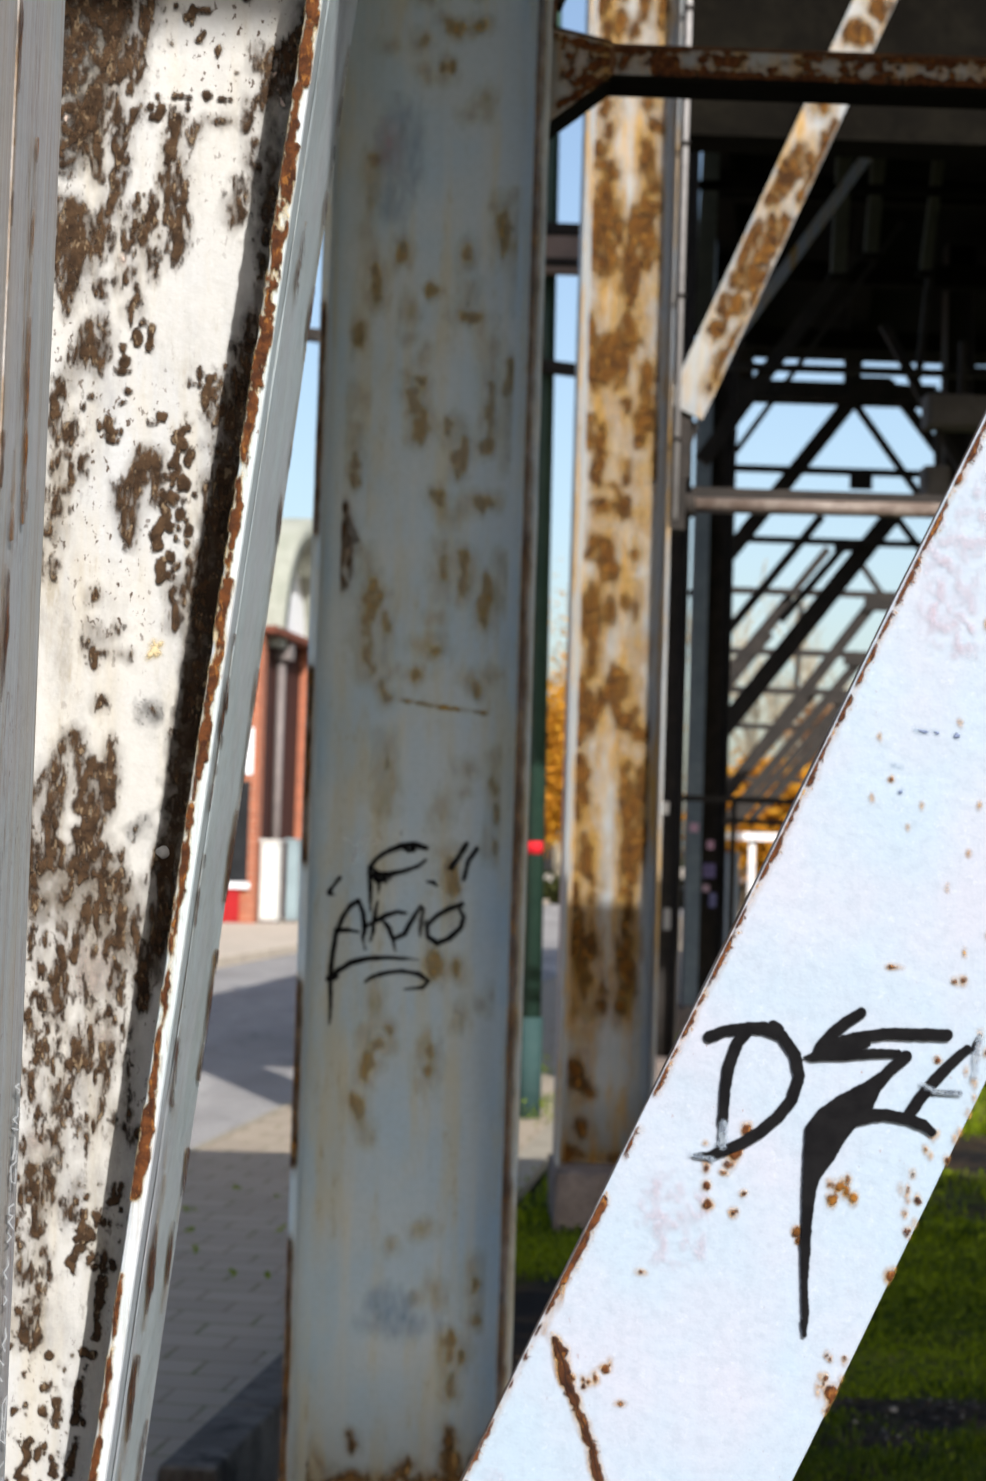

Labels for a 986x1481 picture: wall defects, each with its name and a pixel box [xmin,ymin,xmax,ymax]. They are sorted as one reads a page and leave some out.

corrosion [225,0,320,579]
corrosion [304,303,327,533]
corrosion [221,680,229,743]
corrosion [225,821,237,901]
corrosion [302,668,314,862]
corrosion [327,0,986,1481]
corrosion [199,950,219,1080]
corrosion [290,979,302,1166]
corrosion [89,1273,123,1481]
corrosion [129,1356,147,1473]
corrosion [147,1225,175,1311]
corrosion [279,1240,292,1481]